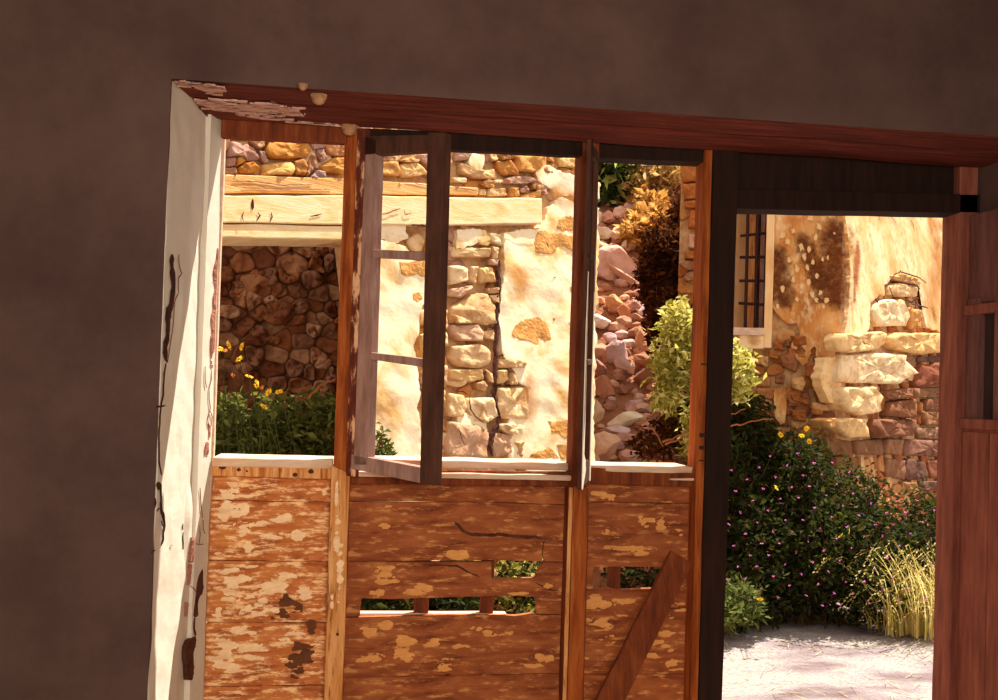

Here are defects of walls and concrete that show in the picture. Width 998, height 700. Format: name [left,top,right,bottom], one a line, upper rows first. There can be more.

peeling [174,80,340,126]
spalling [534,216,573,254]
peeling [779,216,831,309]
crack [456,260,511,456]
spalling [512,316,551,344]
crack [151,254,205,553]
peeling [217,482,306,553]
crack [454,522,542,539]
crack [422,564,480,577]
spalling [182,537,204,680]
peeling [208,565,317,679]
peeling [355,620,440,663]